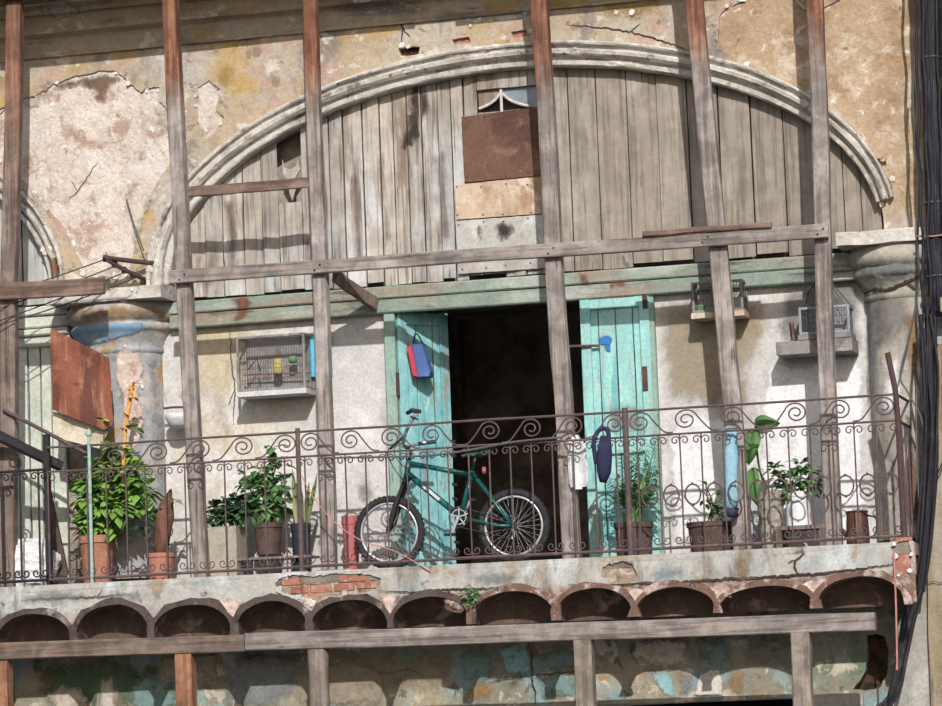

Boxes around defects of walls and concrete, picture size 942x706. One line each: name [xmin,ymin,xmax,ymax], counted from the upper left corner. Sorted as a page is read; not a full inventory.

crack [569,25,689,51]
flaking render [194,81,226,138]
leakage [403,86,428,149]
crack [68,162,98,201]
flaking render [21,71,170,306]
crack [864,276,919,294]
crack [228,326,236,425]
flaking render [276,569,396,613]
spalling [602,559,645,600]
crack [489,644,575,706]
hole [856,634,889,691]